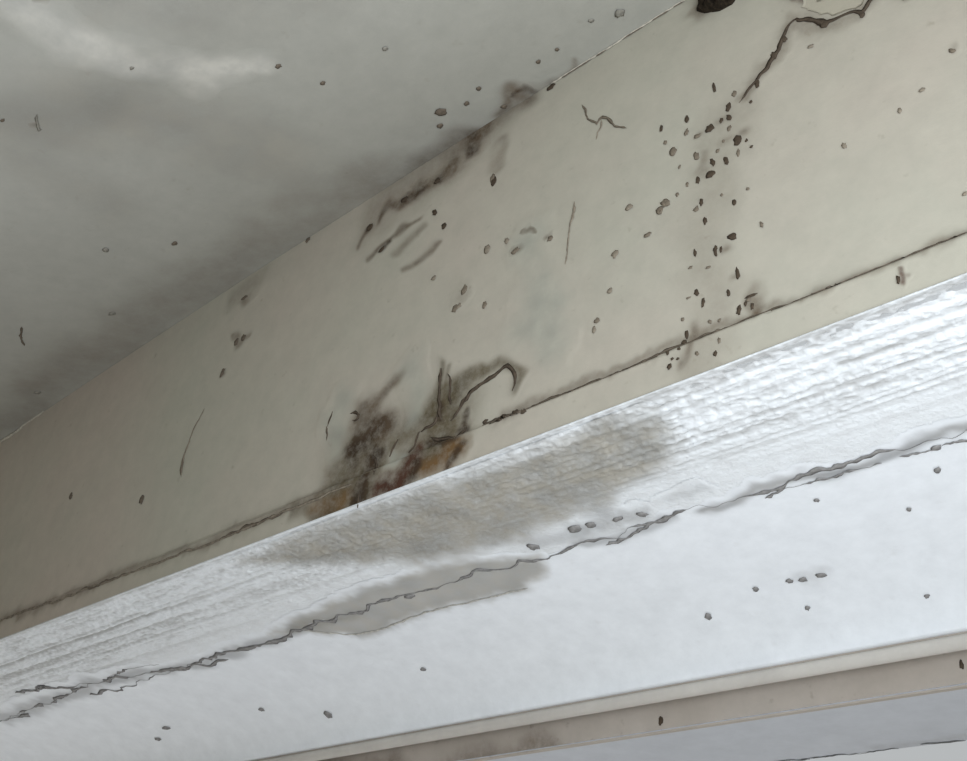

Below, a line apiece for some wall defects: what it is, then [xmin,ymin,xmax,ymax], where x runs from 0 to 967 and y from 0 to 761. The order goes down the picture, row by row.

crack [741,0,918,100]
water stain [644,62,783,389]
rust [283,334,531,530]
water stain [229,402,721,643]
water stain [781,560,841,592]